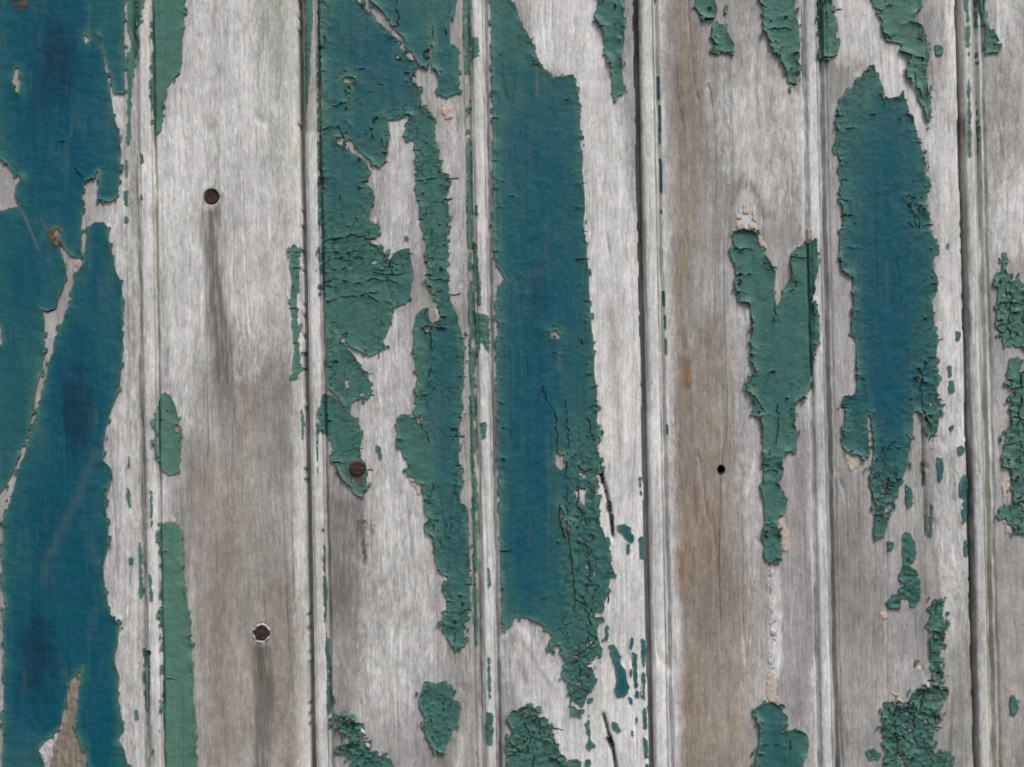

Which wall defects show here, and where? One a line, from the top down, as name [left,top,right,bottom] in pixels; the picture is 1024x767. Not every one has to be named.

peeling [692,0,735,56]
peeling [760,0,802,92]
peeling [815,0,843,61]
peeling [964,0,1002,65]
peeling [967,79,981,158]
peeling [0,0,198,767]
peeling [287,0,649,767]
peeling [728,203,821,591]
peeling [832,0,955,767]
peeling [993,252,1024,537]
crack [600,467,614,533]
crack [604,714,616,767]